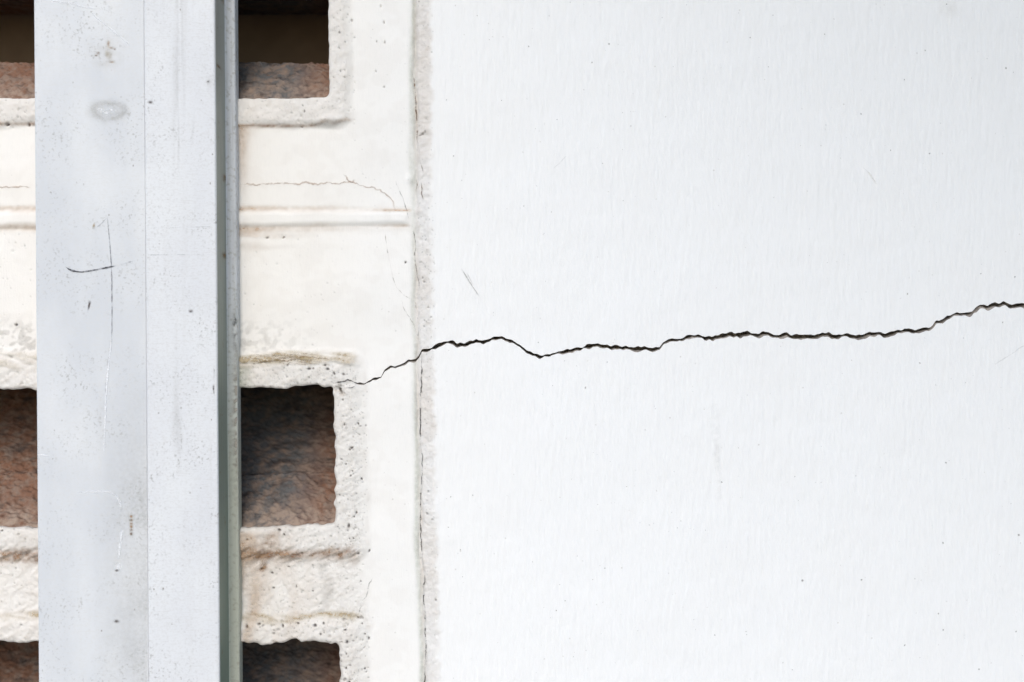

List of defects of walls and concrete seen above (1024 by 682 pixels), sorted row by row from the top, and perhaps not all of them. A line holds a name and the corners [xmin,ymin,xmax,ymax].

crack [337,301,1024,550]